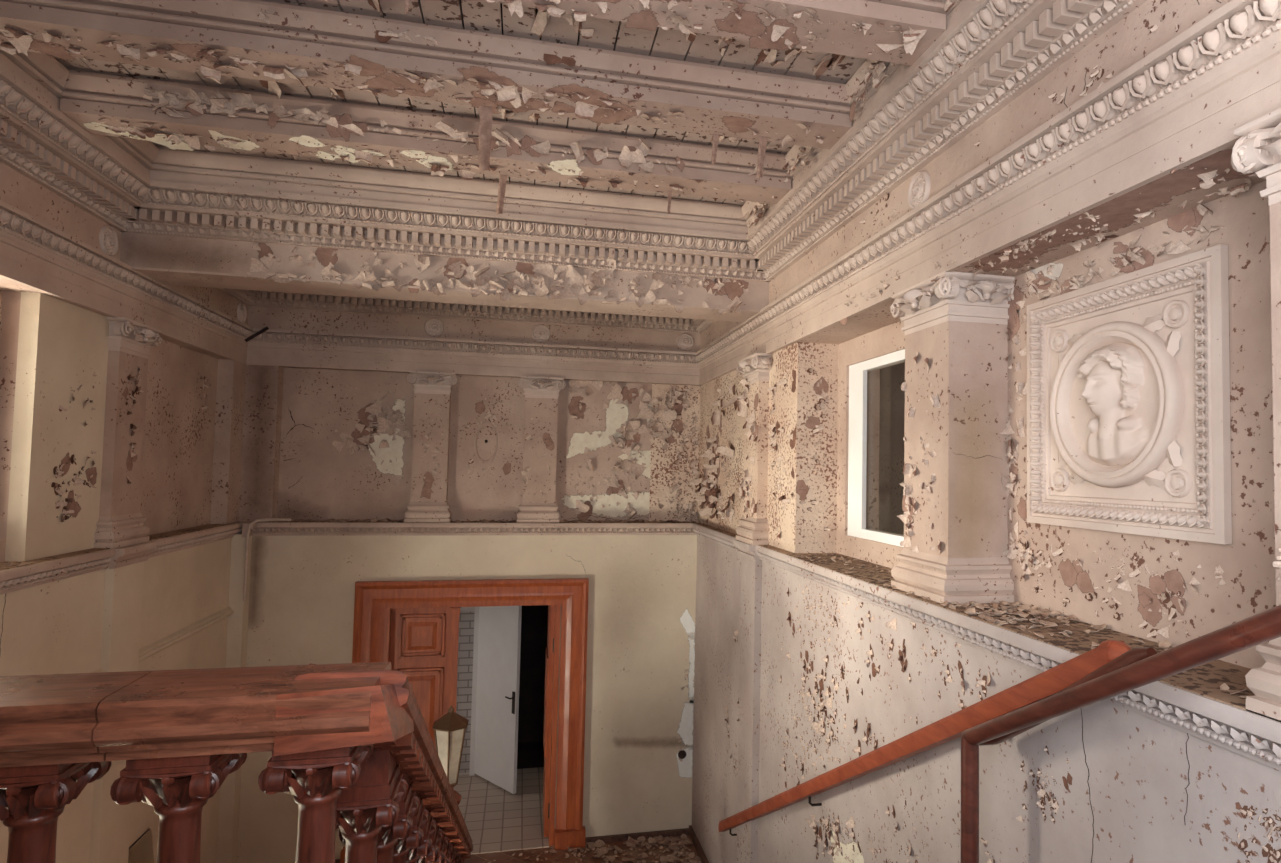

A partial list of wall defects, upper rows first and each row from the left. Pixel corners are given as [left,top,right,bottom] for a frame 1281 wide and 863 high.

peeling [0,27,835,228]
peeling [486,0,927,122]
peeling [245,242,748,315]
peeling [51,450,97,522]
peeling [332,384,444,501]
peeling [465,368,830,531]
peeling [836,149,1253,639]
peeling [676,609,695,778]
peeling [773,585,991,788]
peeling [804,800,931,863]
crack [1081,711,1094,863]
peeling [1235,802,1281,863]